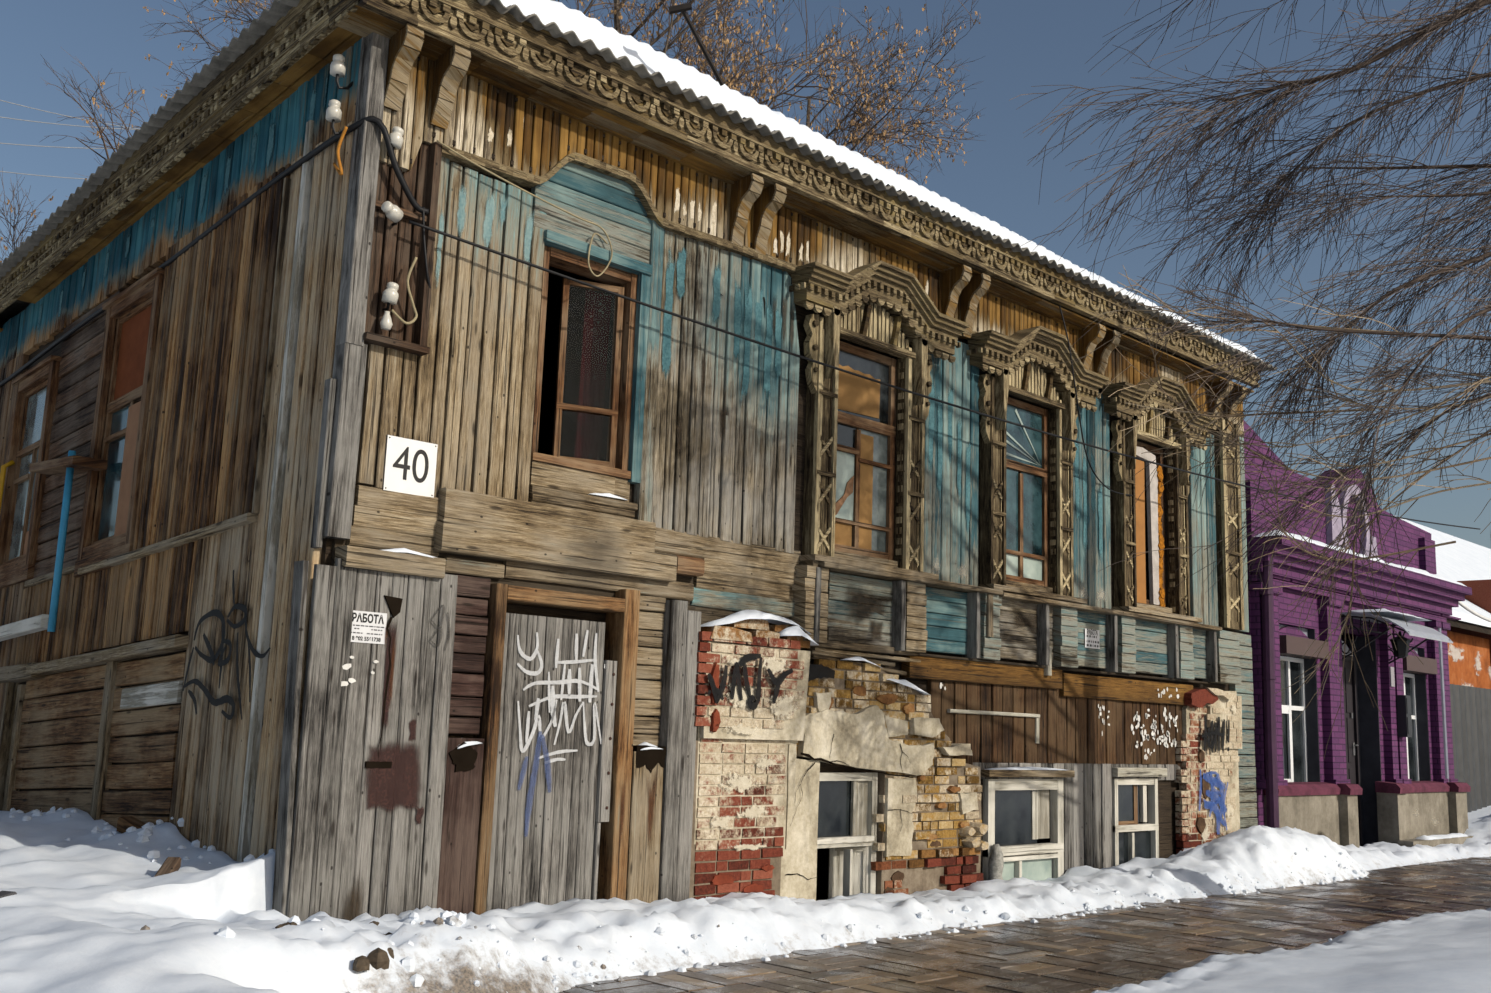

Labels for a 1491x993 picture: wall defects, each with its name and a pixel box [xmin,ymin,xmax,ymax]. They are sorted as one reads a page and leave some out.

peeling [674,188,717,224]
peeling [773,231,809,262]
peeling [662,248,687,376]
peeling [712,266,782,401]
peeling [929,382,971,530]
peeling [762,656,791,675]
peeling [709,658,758,735]
peeling [770,694,798,721]
spalling [934,786,961,809]
spalling [1197,749,1210,799]
peeling [710,757,777,893]
spalling [1195,817,1210,841]